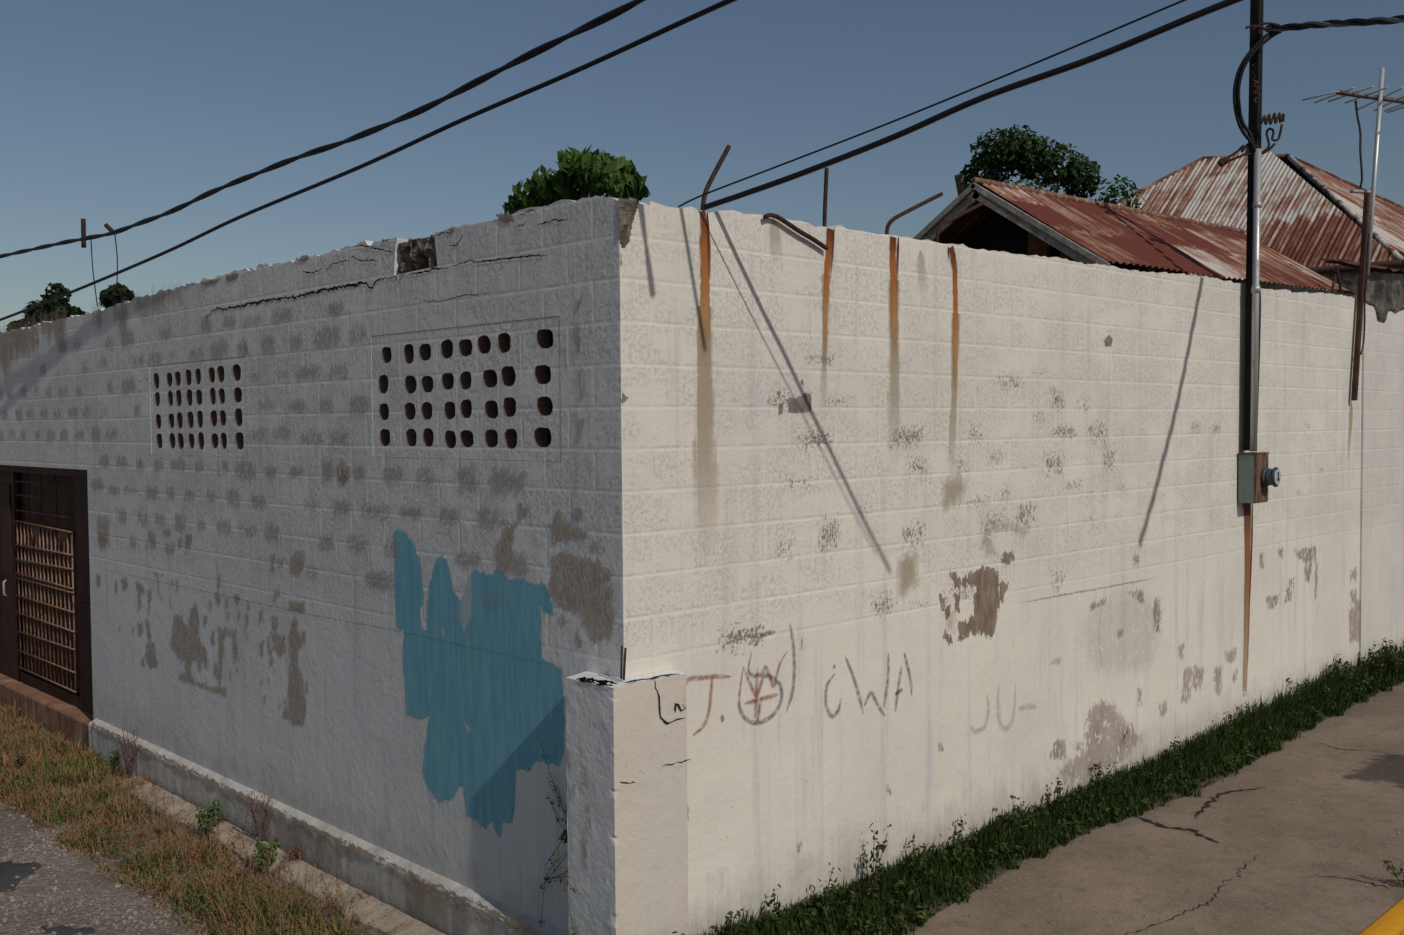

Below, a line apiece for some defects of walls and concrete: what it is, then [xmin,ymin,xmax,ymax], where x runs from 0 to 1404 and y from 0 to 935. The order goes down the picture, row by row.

crack [205,209,569,321]
spalling [382,227,454,279]
rust [697,211,713,470]
rust [822,228,835,366]
rust [890,236,899,396]
rust [948,246,959,425]
peeling [96,572,308,727]
peeling [495,503,529,571]
peeling [548,507,615,648]
peeling [939,550,1015,645]
rust [1243,503,1253,692]